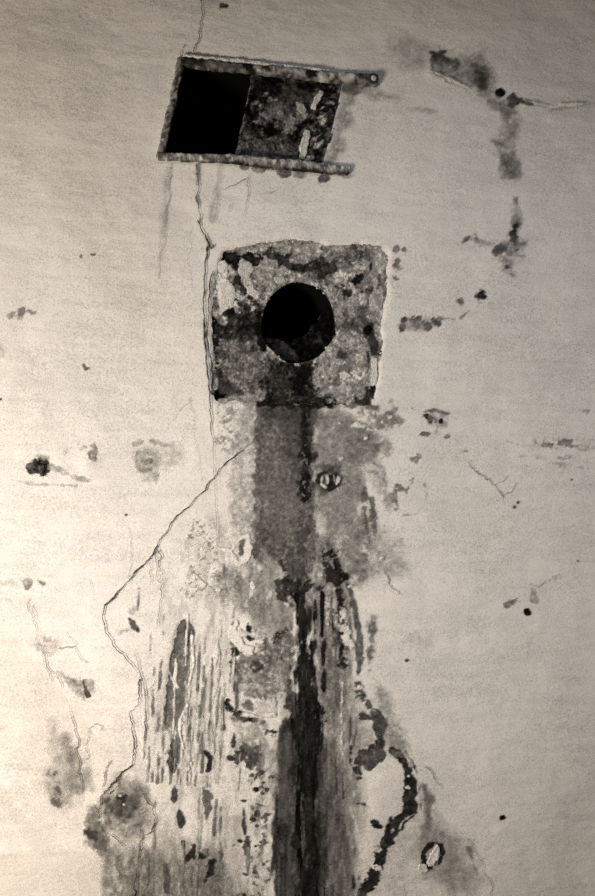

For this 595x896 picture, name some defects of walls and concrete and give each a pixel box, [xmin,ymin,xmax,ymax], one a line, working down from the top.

water stain [429,50,534,115]
water stain [325,84,376,164]
water stain [495,126,521,179]
water stain [392,245,406,280]
water stain [462,214,526,276]
water stain [399,316,448,332]
crack [27,163,262,896]
water stain [215,399,413,896]
peeling [126,520,297,896]
water stain [420,784,471,885]